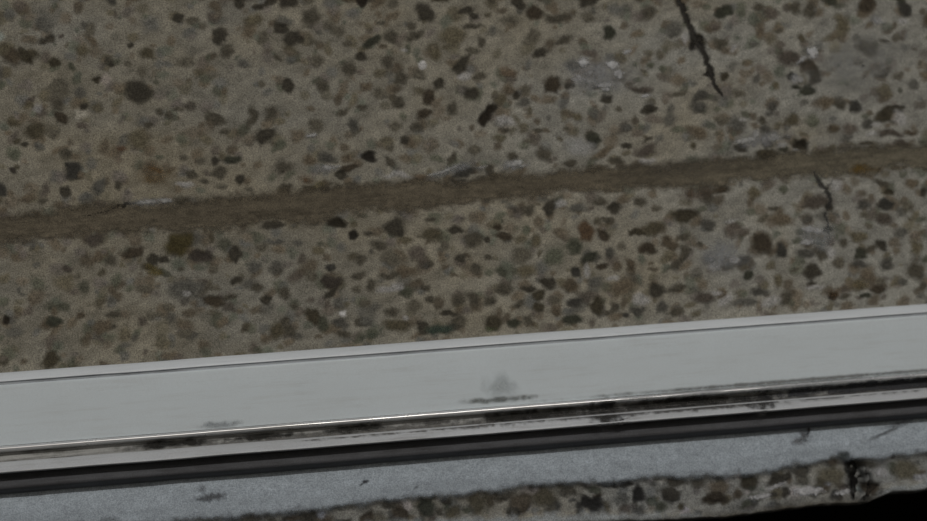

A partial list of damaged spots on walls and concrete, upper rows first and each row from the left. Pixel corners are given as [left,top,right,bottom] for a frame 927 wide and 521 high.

crack [676,0,723,96]
crack [814,171,832,238]
spalling [749,482,784,500]
spalling [793,486,823,496]
spalling [835,463,887,501]